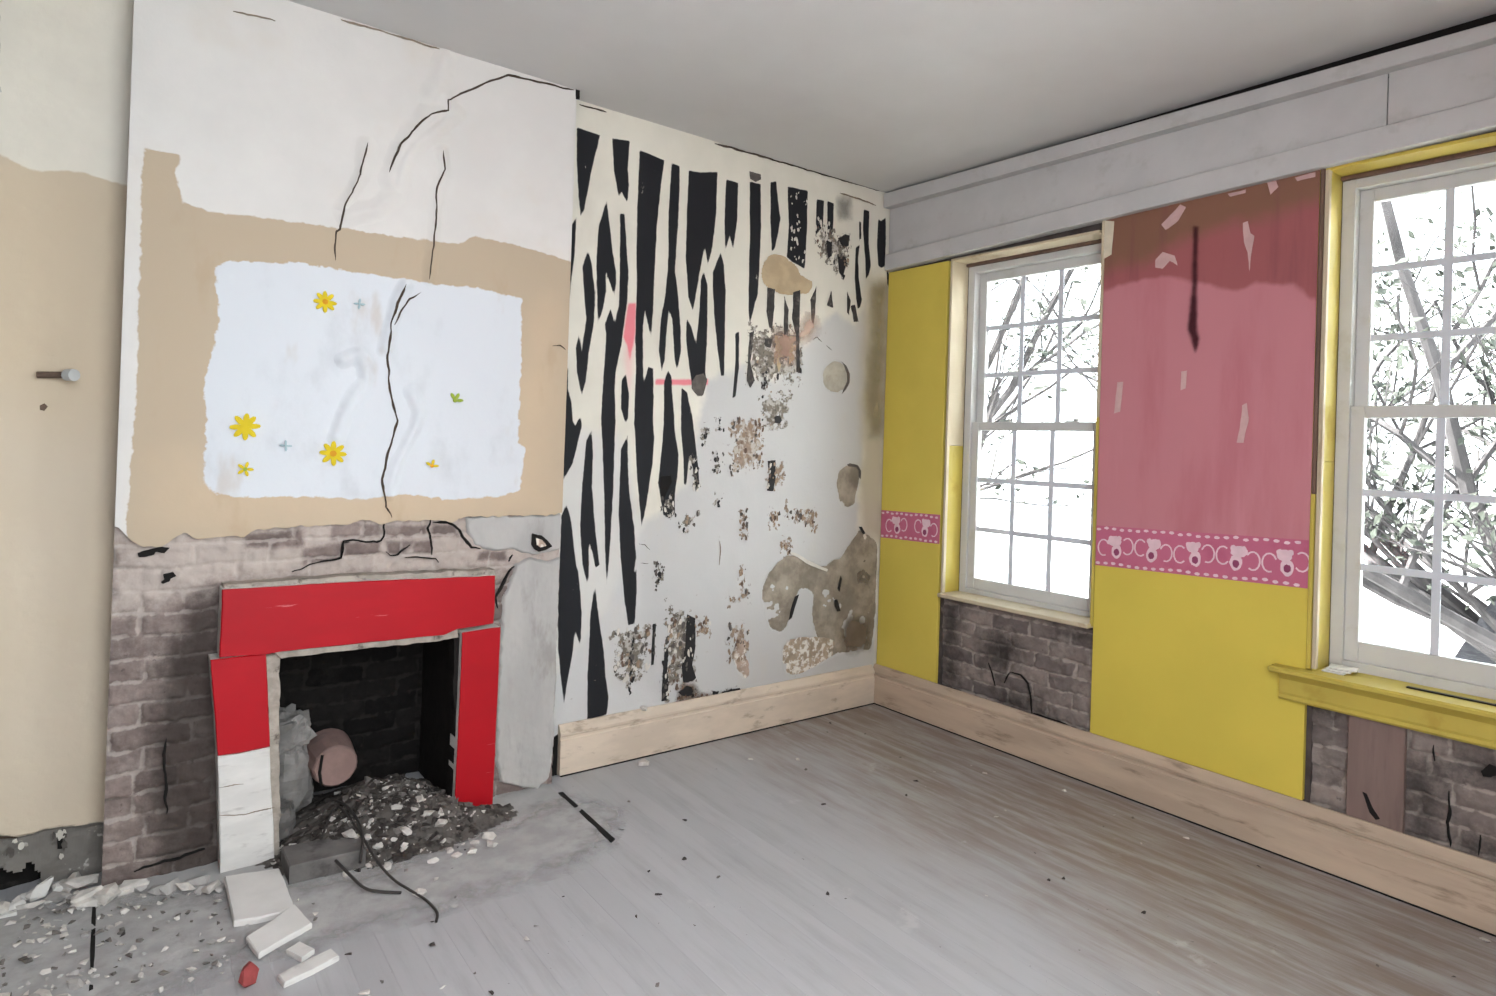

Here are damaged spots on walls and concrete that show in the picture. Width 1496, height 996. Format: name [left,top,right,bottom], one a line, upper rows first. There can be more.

crack [715,143,878,206]
crack [292,74,606,608]
flaking render [608,192,877,711]
flaking render [0,838,41,890]
peeling [52,829,68,859]
flaking render [101,516,559,886]
flaking render [941,598,1093,733]
flaking render [1310,707,1349,814]
flaking render [1404,729,1496,863]
crack [1432,745,1482,856]